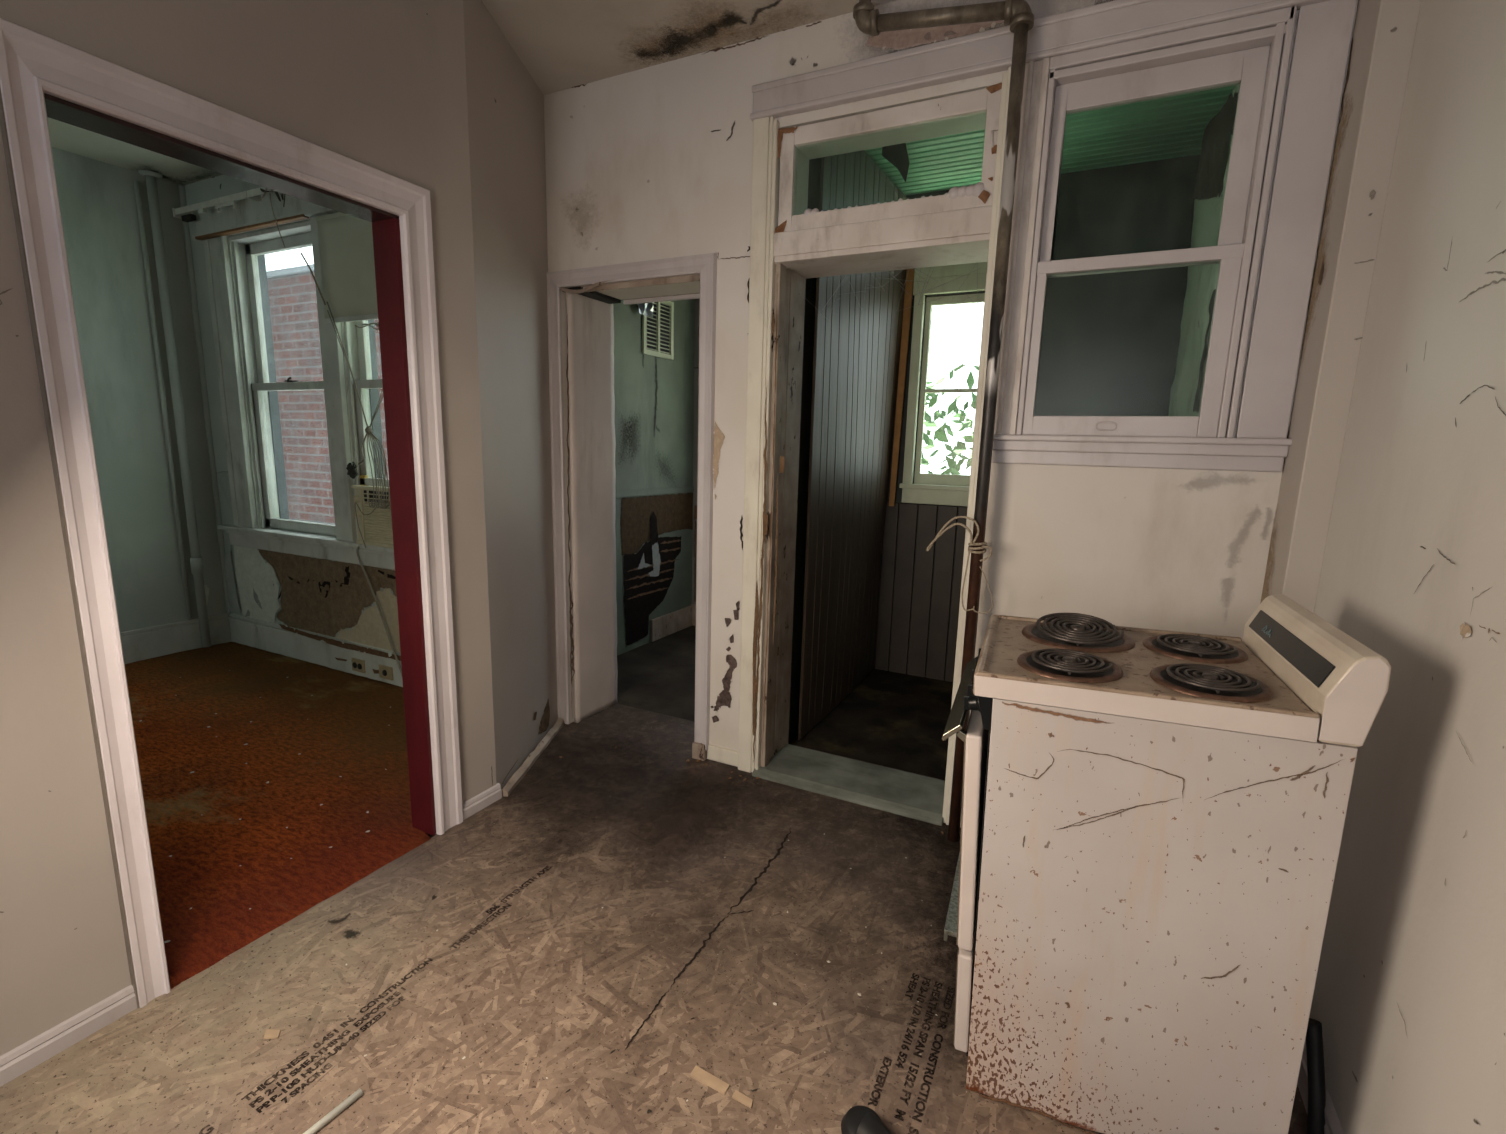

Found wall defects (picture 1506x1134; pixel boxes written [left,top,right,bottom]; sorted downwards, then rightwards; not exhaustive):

damp [637,0,781,57]
peeling [711,275,785,761]
flaking render [224,545,401,674]